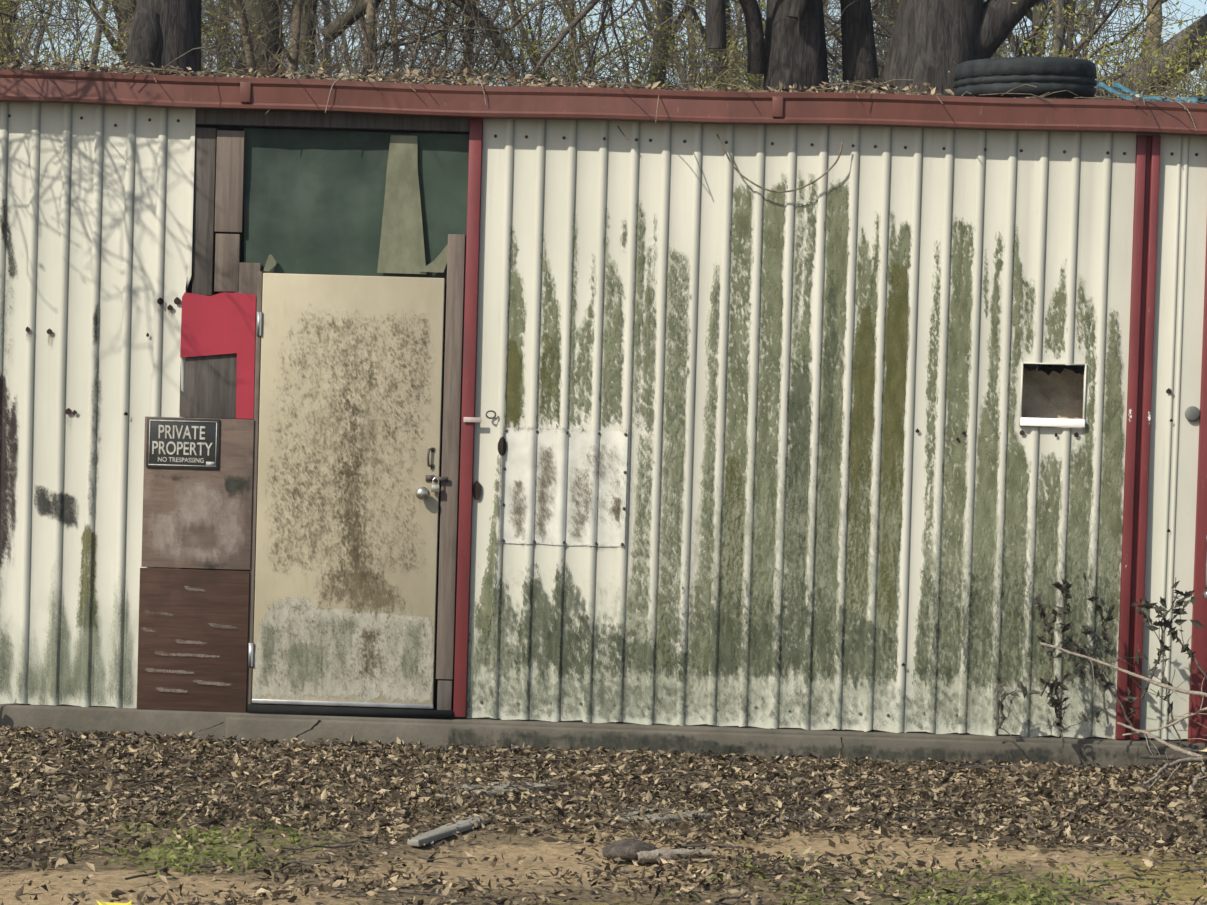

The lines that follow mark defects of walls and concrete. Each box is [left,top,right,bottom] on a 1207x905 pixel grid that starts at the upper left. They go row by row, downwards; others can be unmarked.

water stain [0,524,131,701]
water stain [153,476,249,569]
water stain [262,318,429,689]
water stain [505,178,912,687]
water stain [912,220,1124,692]